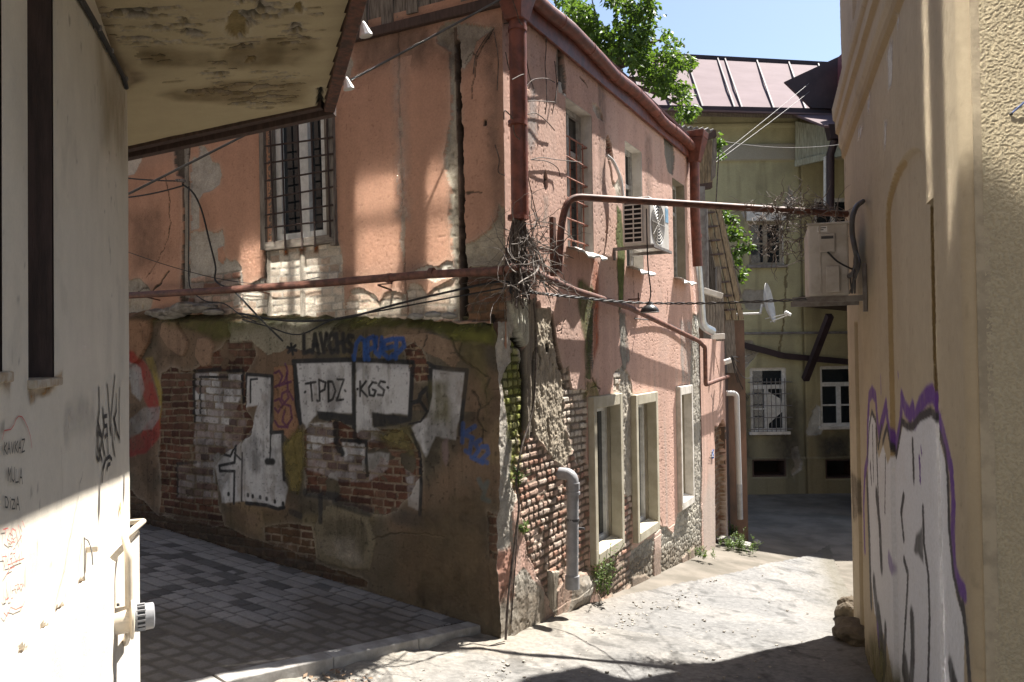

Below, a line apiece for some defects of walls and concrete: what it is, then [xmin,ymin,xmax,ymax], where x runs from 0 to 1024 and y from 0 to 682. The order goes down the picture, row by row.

flaking render [128,145,634,638]
crack [397,27,494,445]